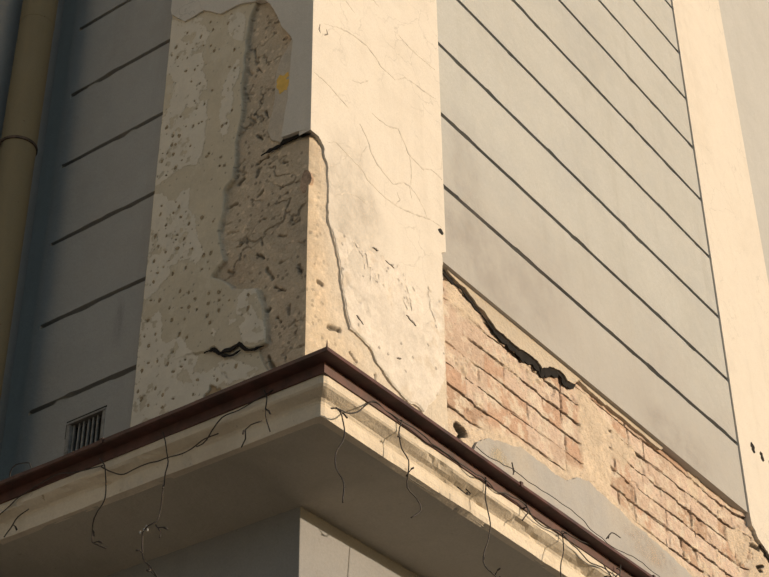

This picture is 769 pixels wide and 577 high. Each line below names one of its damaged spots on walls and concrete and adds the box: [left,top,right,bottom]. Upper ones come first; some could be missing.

crack [204,342,264,357]
flaking render [130,2,406,427]
crack [442,269,577,389]
spalling [332,228,769,577]